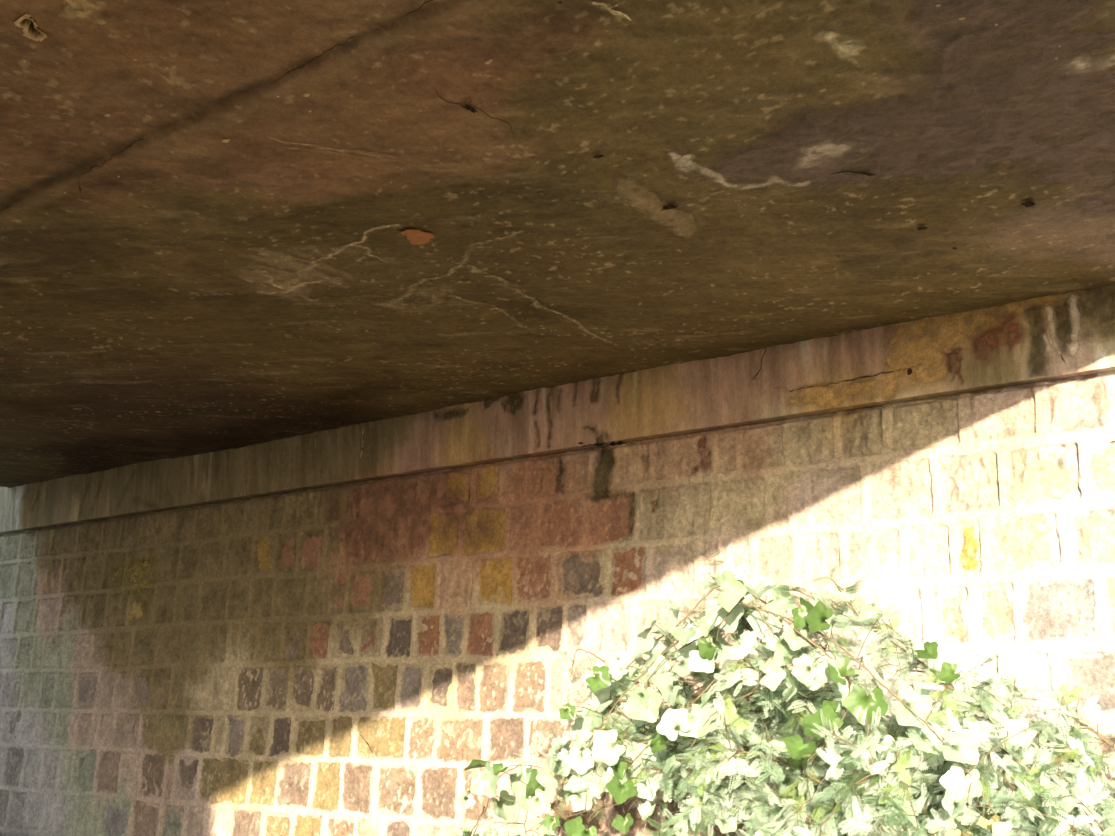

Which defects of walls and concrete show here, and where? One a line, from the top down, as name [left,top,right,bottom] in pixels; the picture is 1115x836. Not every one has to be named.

crack [269,36,356,84]
damp [669,0,1115,189]
crack [830,169,877,177]
damp [791,291,1115,407]
damp [484,387,561,447]
damp [587,427,615,501]